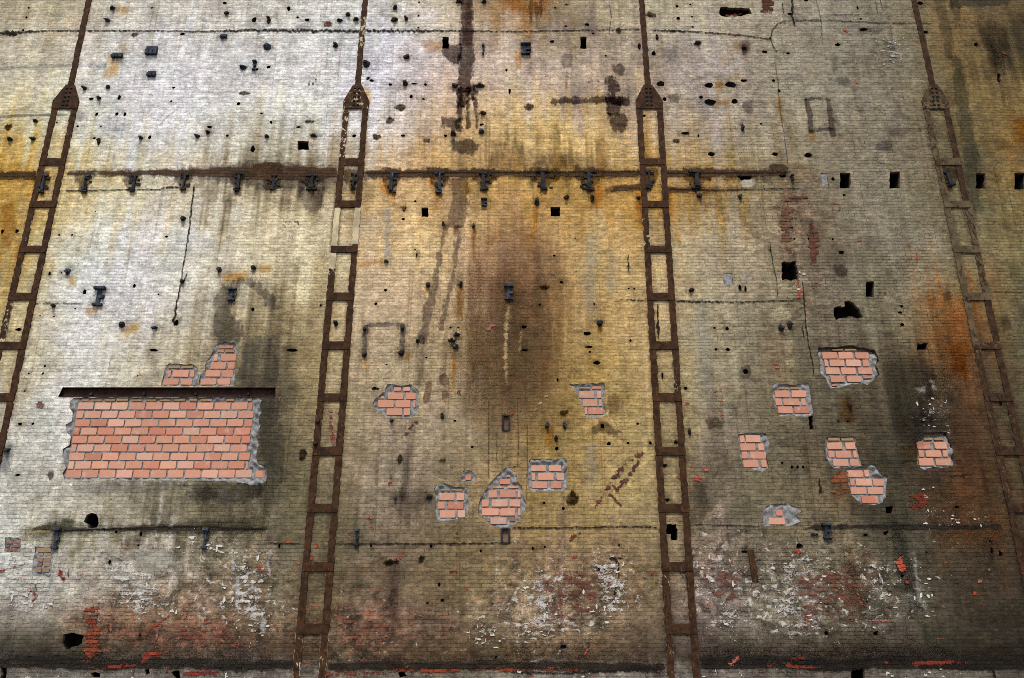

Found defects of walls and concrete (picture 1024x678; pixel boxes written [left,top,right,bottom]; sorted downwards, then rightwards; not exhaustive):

damp [442,43,462,64]
damp [455,84,480,130]
crack [172,185,195,323]
damp [503,306,521,383]